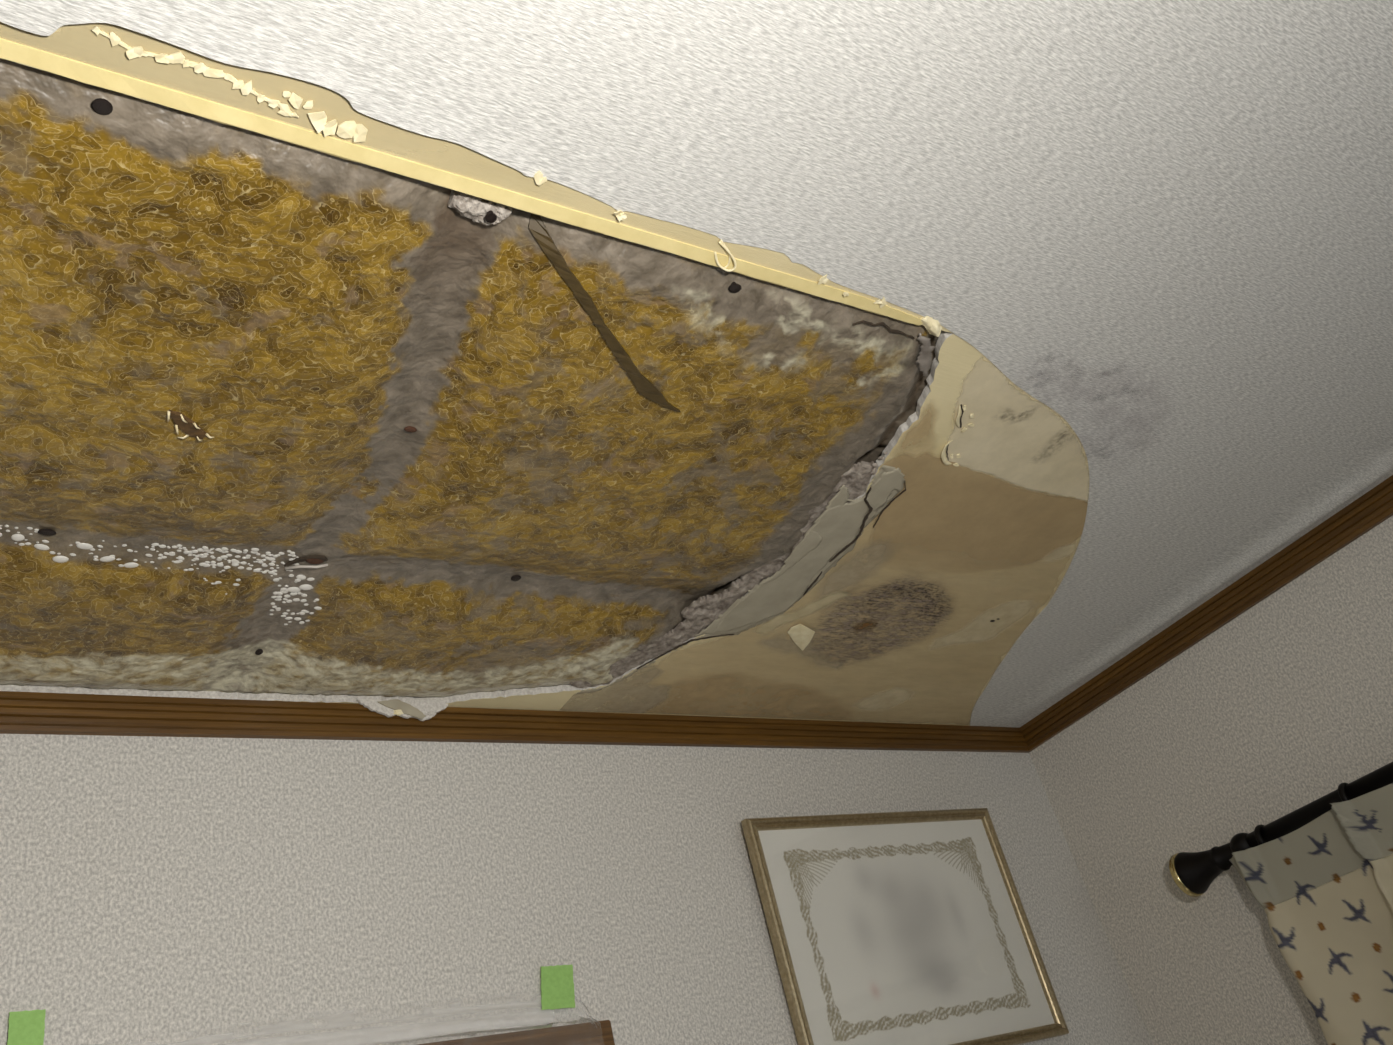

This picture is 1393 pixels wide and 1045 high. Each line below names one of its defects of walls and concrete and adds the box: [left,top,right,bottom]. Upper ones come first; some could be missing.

peeling [92,26,367,143]
peeling [534,170,547,186]
spalling [569,451,906,695]
damp [606,413,1088,724]
peeling [378,699,426,720]